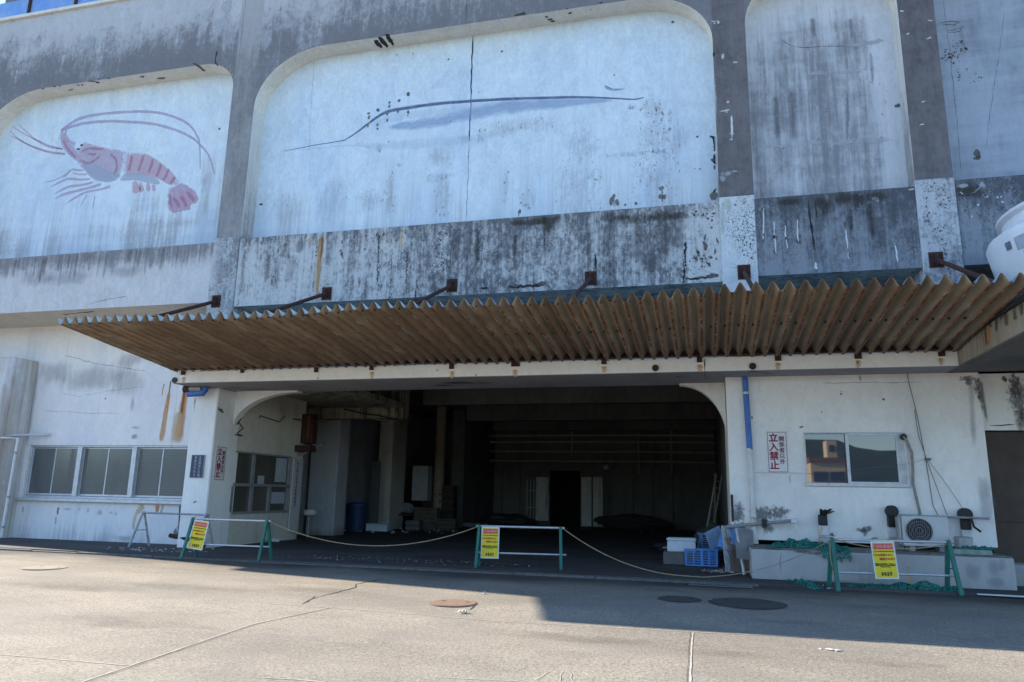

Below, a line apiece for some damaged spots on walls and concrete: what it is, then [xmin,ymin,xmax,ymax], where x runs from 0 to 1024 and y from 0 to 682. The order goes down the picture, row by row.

crack [465,39,473,217]
rust [307,237,323,290]
rust [160,377,187,440]
mould [1009,372,1024,424]